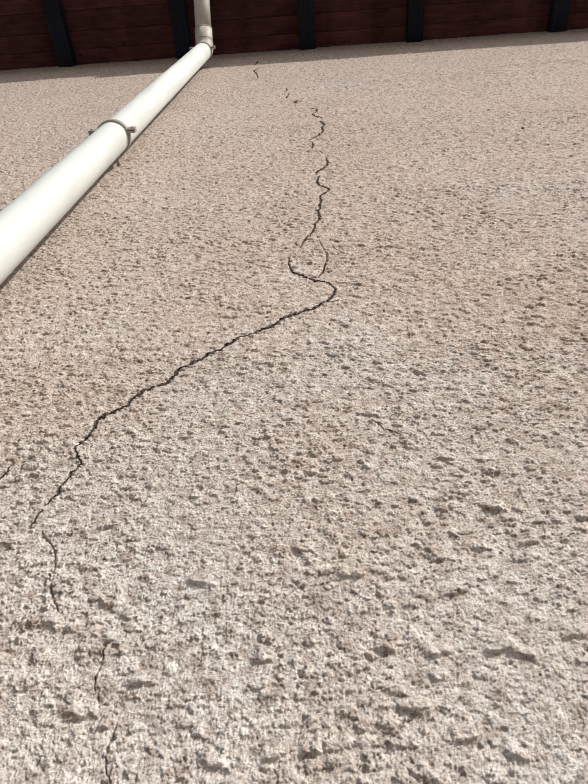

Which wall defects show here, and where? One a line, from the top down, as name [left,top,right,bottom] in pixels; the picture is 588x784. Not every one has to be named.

crack [29,108,338,603]